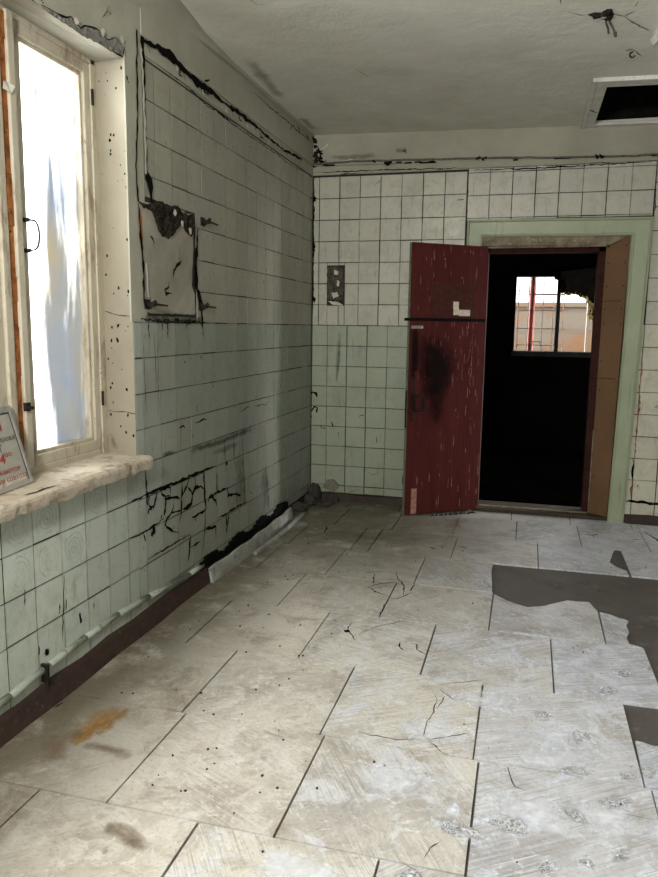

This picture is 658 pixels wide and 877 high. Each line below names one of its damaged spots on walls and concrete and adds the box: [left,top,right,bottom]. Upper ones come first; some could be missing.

spalling [41,0,129,83]
flaking render [138,201,203,328]
crack [130,466,246,561]
crack [344,572,425,654]
corrosion [74,711,120,743]
crack [360,680,478,756]